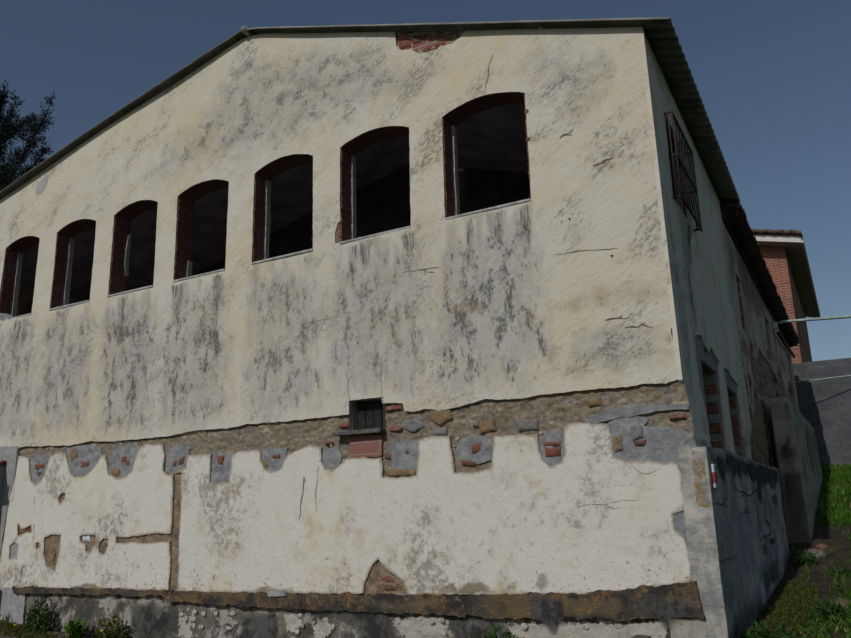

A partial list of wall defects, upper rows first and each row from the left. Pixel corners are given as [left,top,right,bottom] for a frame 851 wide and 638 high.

damp [102,298,156,430]
damp [164,274,225,423]
damp [246,276,321,403]
damp [334,233,423,378]
damp [436,204,546,382]
flaking render [65,443,140,478]
damp [715,435,800,525]
flaking render [36,535,61,573]
flaking render [364,560,407,595]
peeling [284,613,335,638]
peeling [392,615,450,638]
peeling [503,619,669,638]